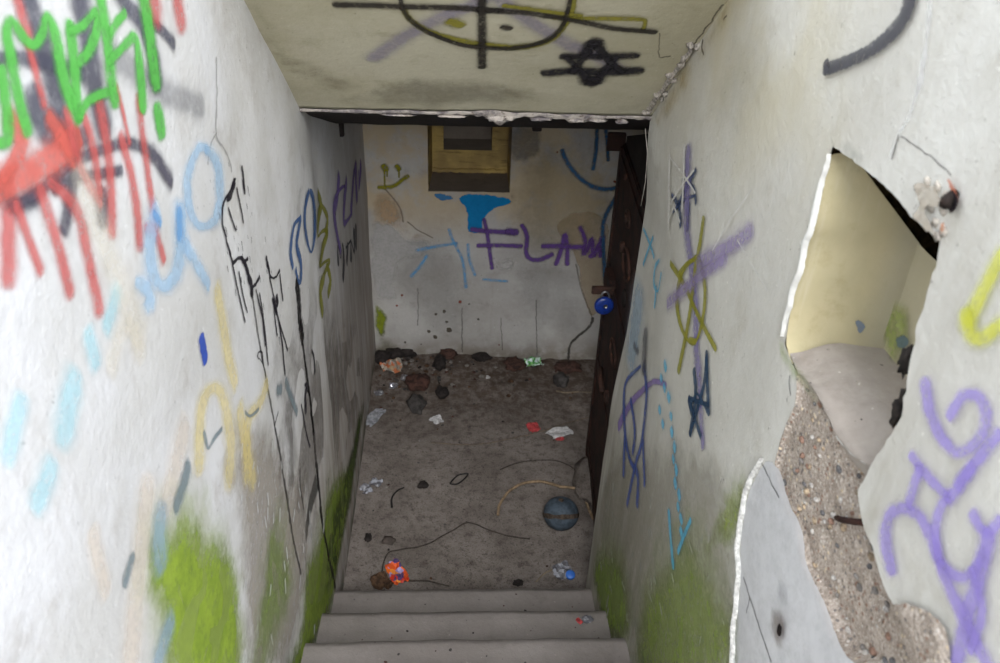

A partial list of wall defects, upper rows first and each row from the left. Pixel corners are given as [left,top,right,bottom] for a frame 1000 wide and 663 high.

spalling [299,42,700,126]
crack [891,134,951,176]
spalling [780,147,841,337]
spalling [864,169,952,261]
spalling [889,344,914,429]
spalling [729,374,951,663]